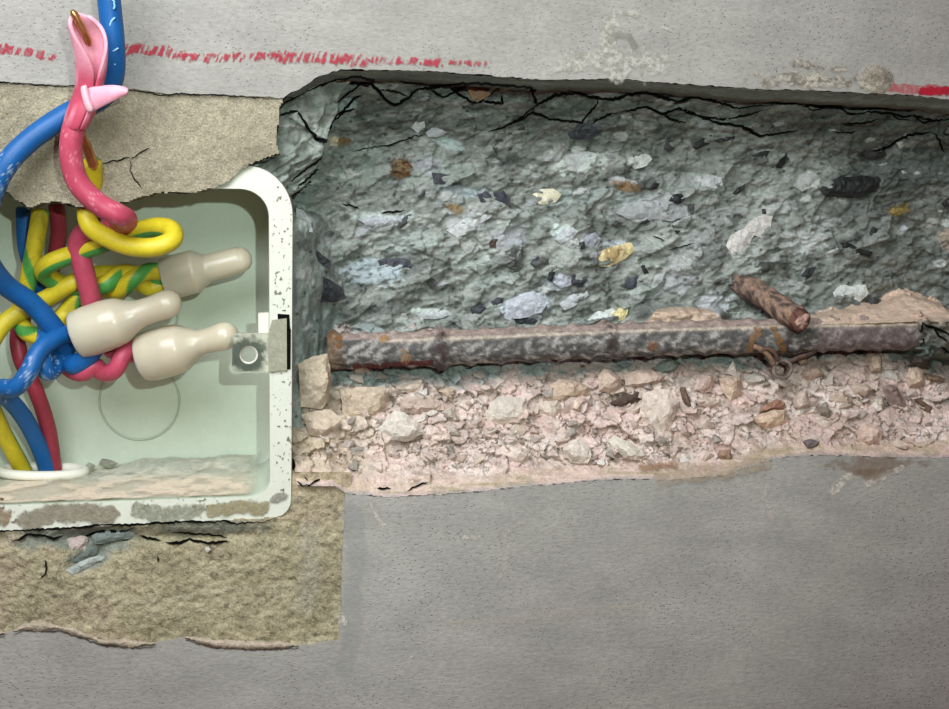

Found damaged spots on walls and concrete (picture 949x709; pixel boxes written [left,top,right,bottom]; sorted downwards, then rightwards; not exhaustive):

flaking render [0,81,75,152]
flaking render [5,133,84,209]
crack [128,75,798,195]
crack [803,106,949,152]
spalling [85,69,949,497]
crack [920,322,949,353]
crack [0,516,278,578]
flaking render [0,470,352,651]